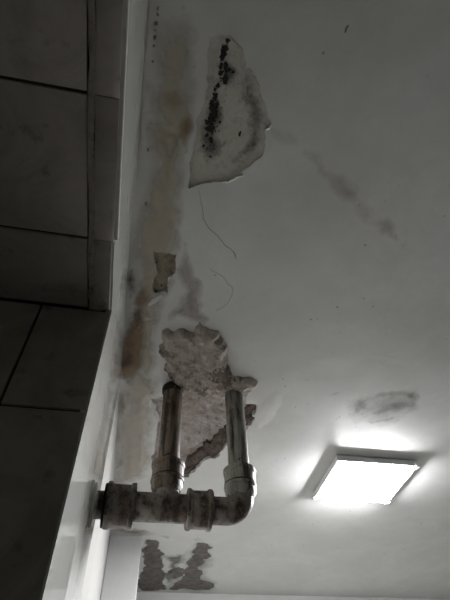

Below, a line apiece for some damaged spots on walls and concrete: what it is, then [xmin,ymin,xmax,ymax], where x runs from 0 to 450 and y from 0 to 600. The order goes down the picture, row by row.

mould [202,38,234,158]
peeling [186,34,272,190]
leakage [138,44,191,370]
peeling [152,252,177,294]
spalling [149,396,163,459]
spalling [179,390,227,474]
spalling [243,395,256,426]